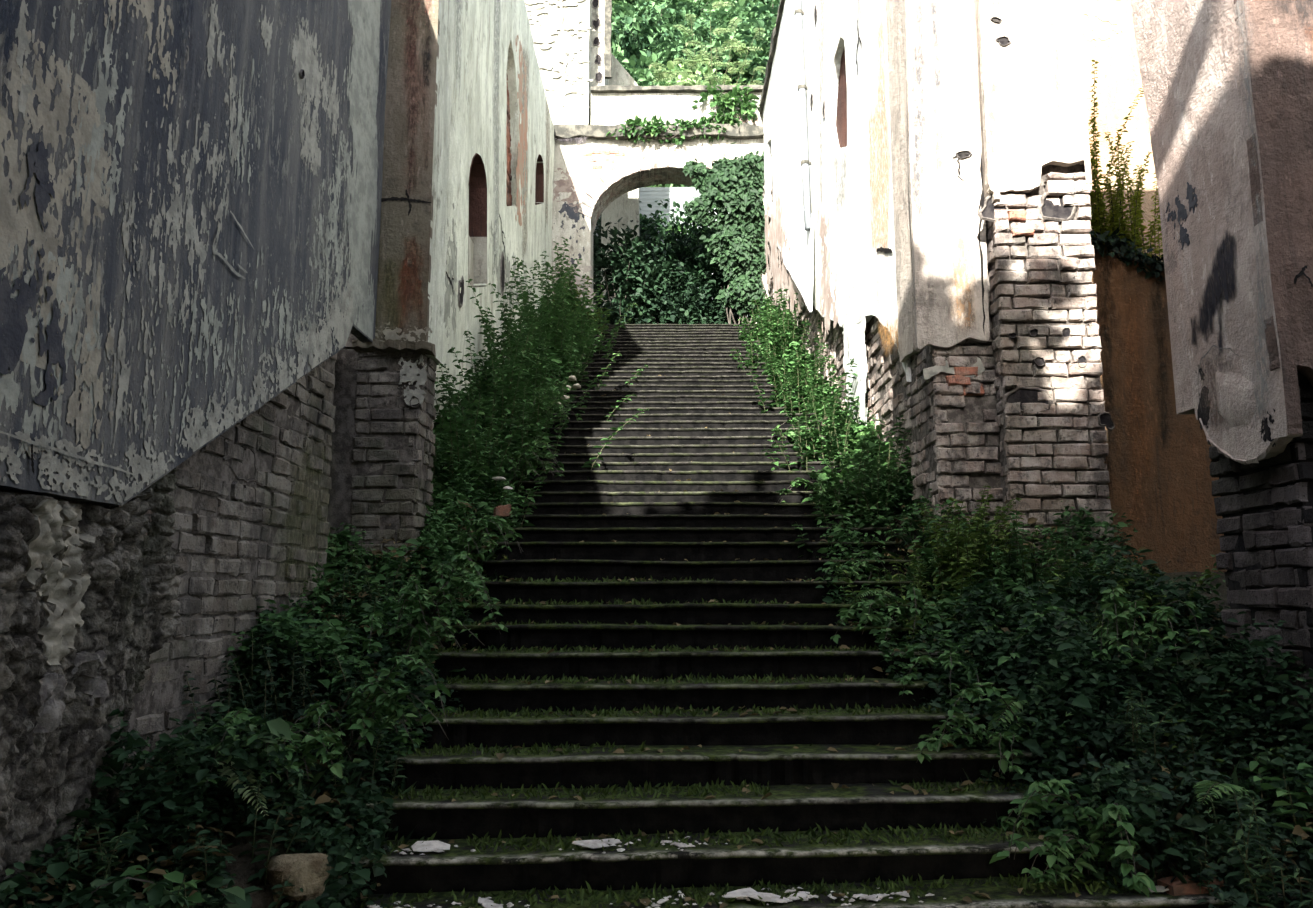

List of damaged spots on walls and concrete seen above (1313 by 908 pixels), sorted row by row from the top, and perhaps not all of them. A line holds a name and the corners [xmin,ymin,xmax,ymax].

peeling [0,0,458,733]
flaking render [923,172,1115,567]
peeling [1196,357,1277,465]
crack [1294,265,1313,287]